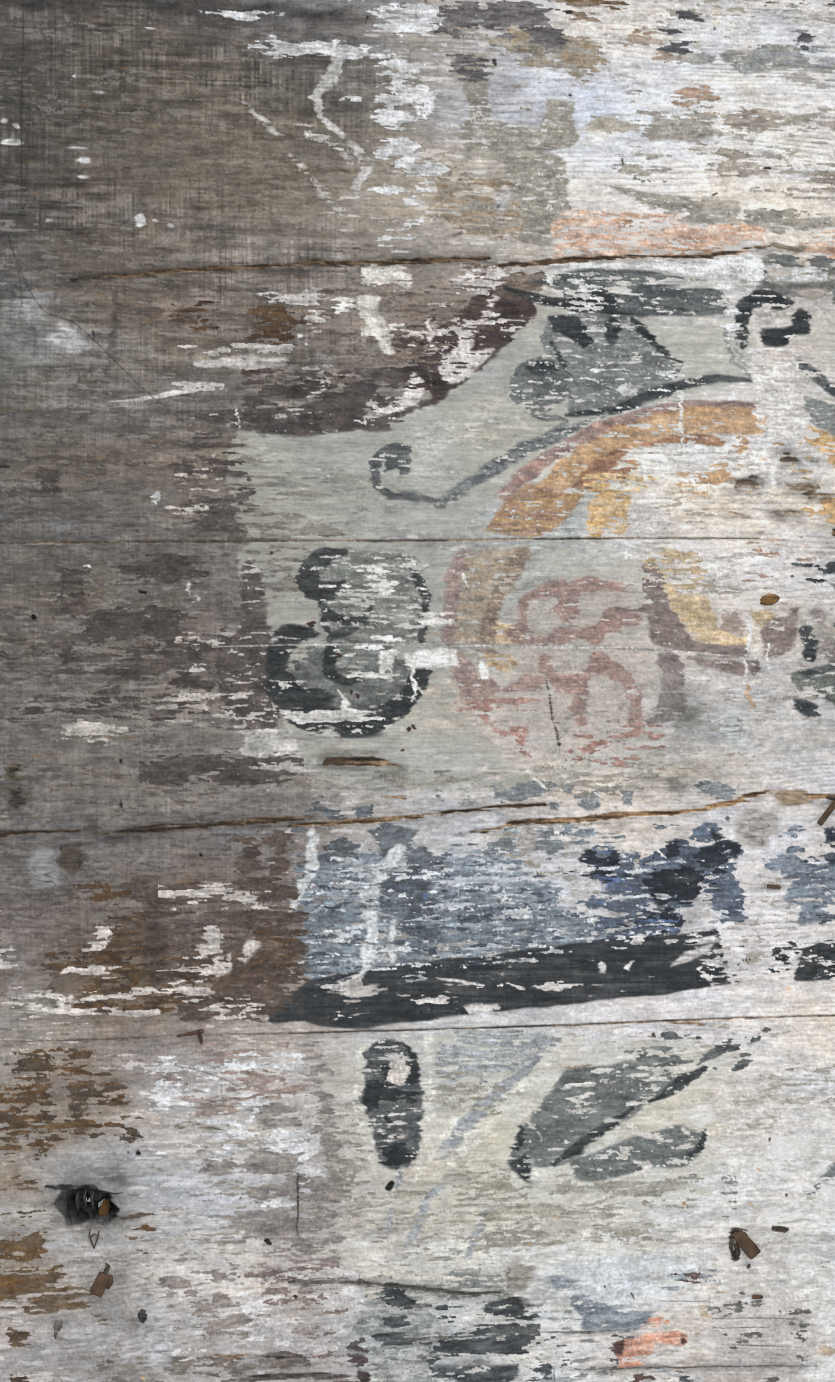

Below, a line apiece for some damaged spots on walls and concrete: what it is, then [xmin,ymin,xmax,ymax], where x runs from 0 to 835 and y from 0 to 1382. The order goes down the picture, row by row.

peeling [0,0,835,1029]
rust [6,1328,32,1347]
rust [0,1047,144,1315]
rust [131,1213,157,1256]